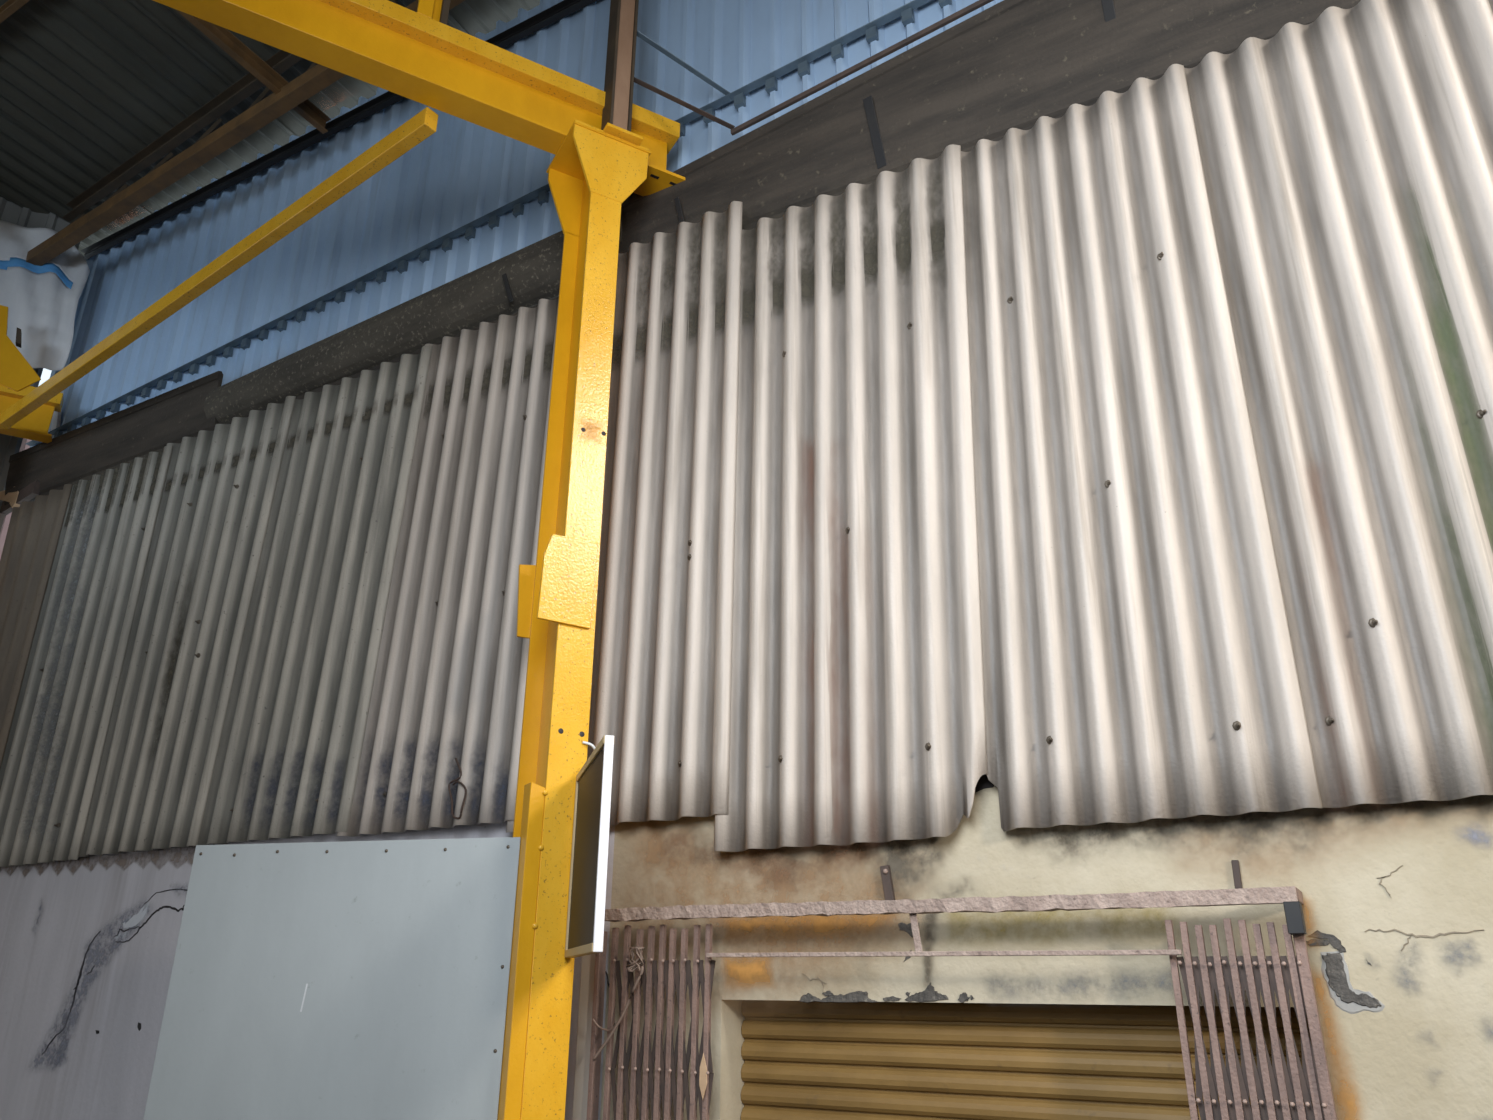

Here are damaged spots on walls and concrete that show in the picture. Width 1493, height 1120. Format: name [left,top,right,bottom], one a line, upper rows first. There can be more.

crack [1365,865,1484,951]
crack [42,889,188,1055]
spalling [799,982,975,1003]
spalling [1306,930,1385,1014]
rust [1337,1080,1357,1120]